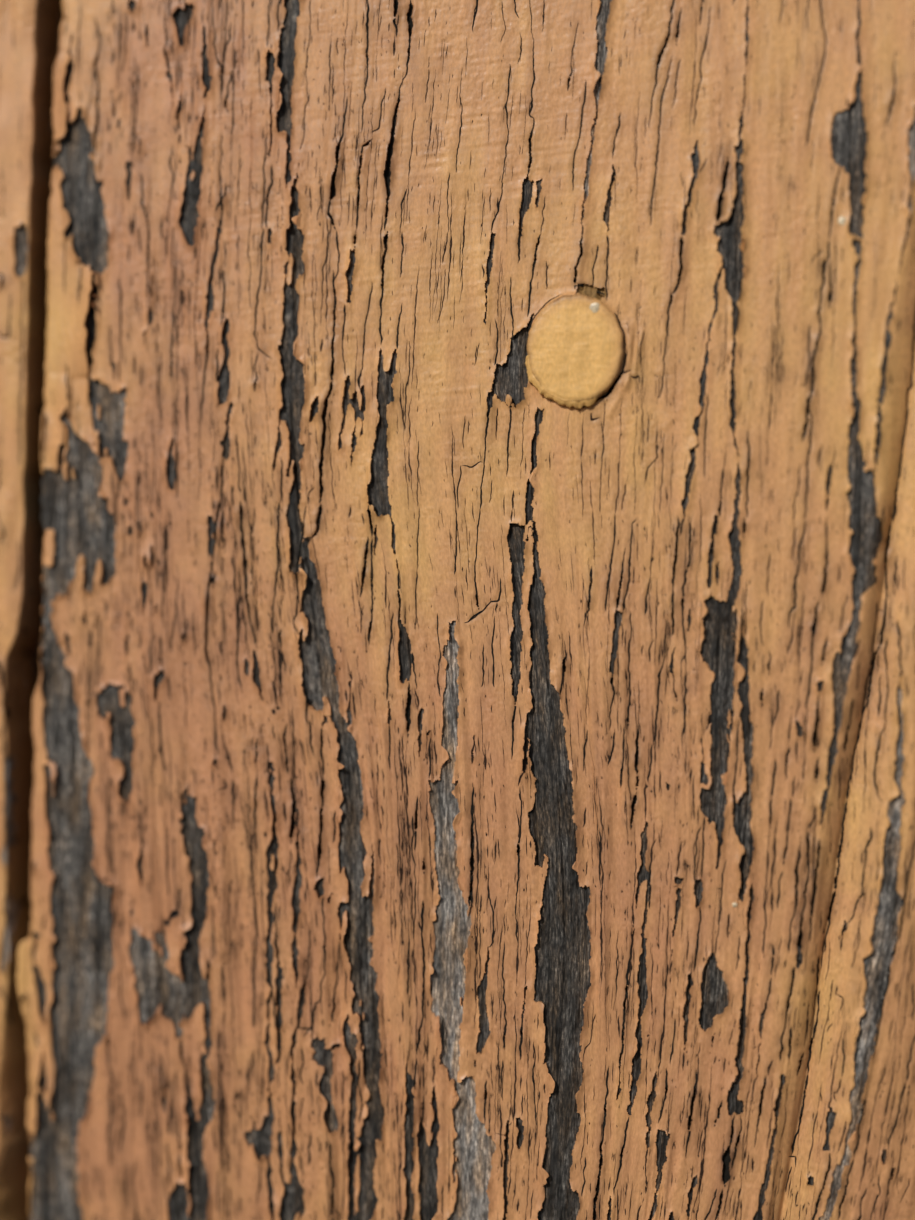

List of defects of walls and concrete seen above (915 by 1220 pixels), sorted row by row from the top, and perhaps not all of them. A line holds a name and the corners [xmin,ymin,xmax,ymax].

peeling [23,3,217,1220]
peeling [245,0,385,1220]
peeling [338,349,398,568]
peeling [398,620,412,684]
peeling [403,621,524,1220]
peeling [487,313,534,408]
peeling [519,175,543,243]
peeling [507,408,591,1220]
peeling [617,822,698,1220]
peeling [681,0,765,1115]
peeling [818,672,906,1220]
peeling [817,0,915,825]